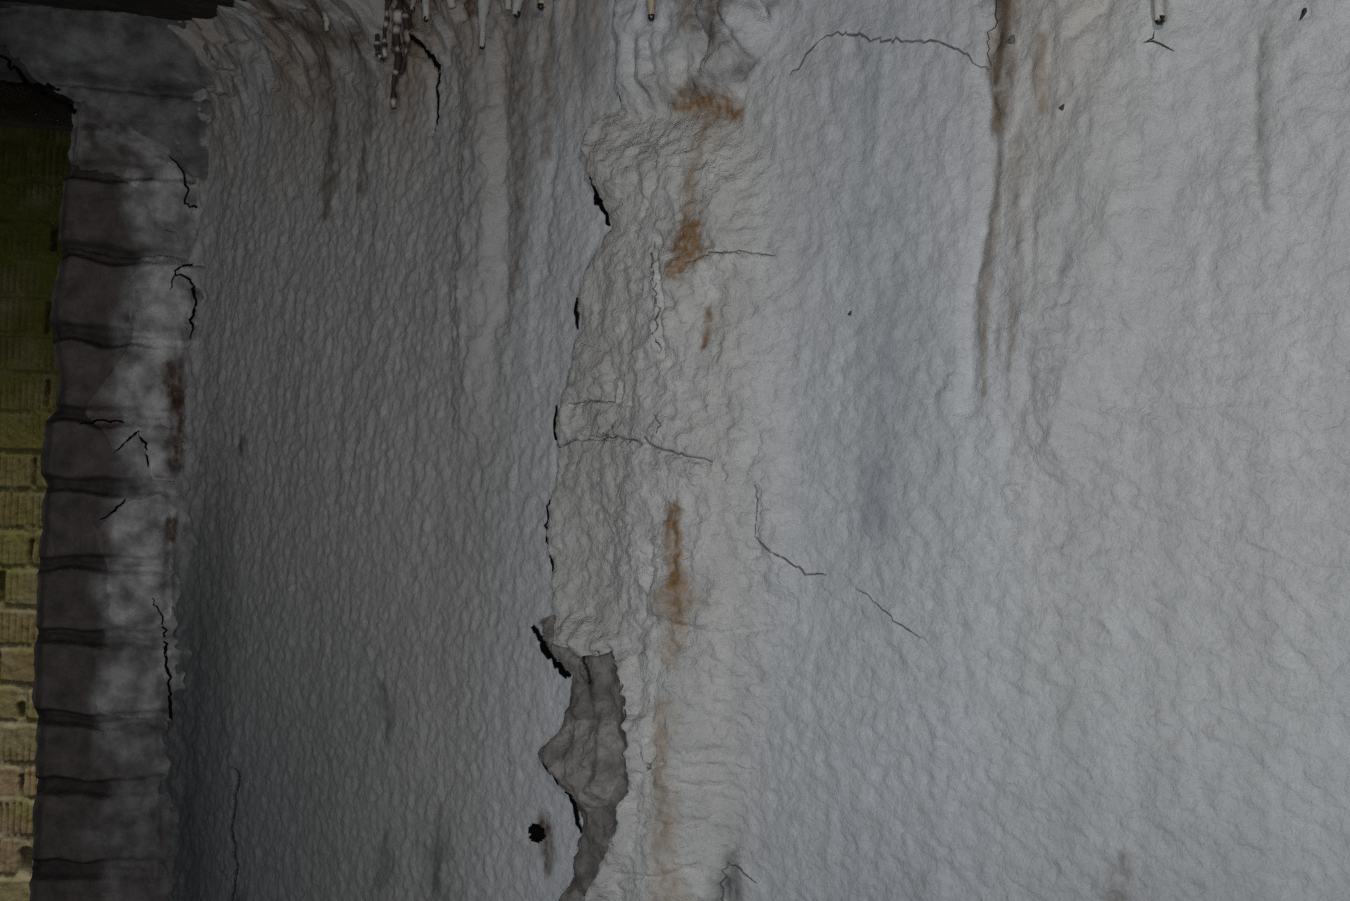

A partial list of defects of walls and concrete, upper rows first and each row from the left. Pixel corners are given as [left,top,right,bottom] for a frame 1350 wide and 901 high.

crack [789,0,998,76]
water stain [991,0,1015,129]
rust [673,90,741,119]
crack [169,155,198,209]
crack [589,176,611,226]
rust [667,221,701,274]
crack [169,263,197,339]
crack [572,297,580,329]
crack [80,419,149,466]
crack [544,500,554,572]
peeling [537,100,808,901]
rust [666,508,681,625]